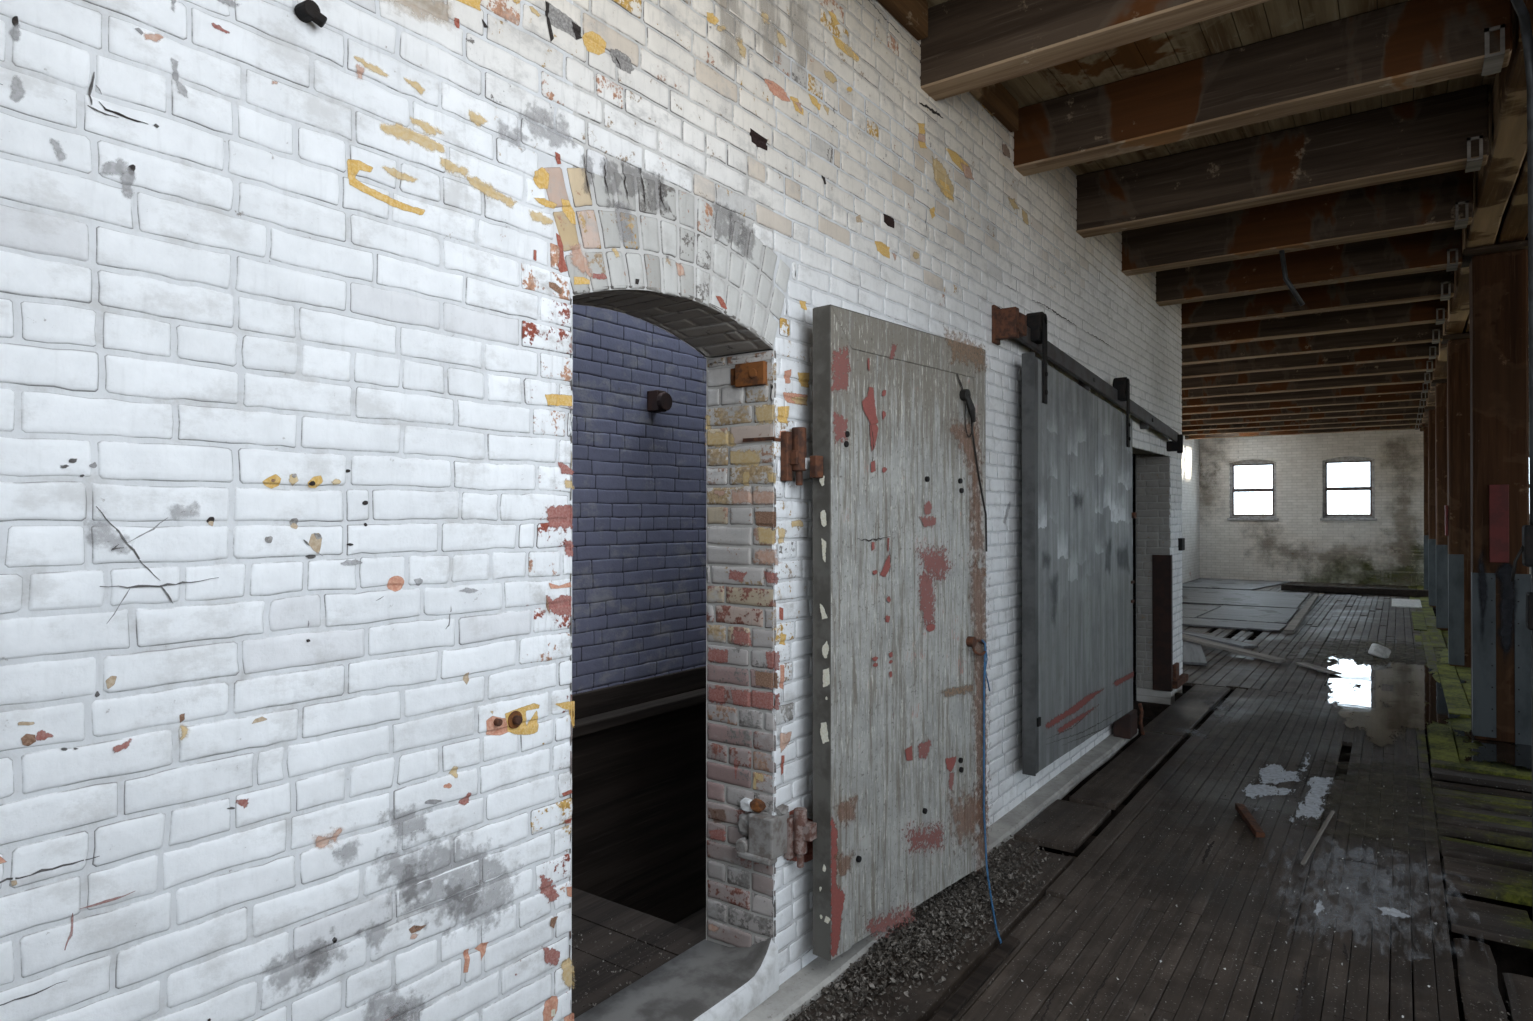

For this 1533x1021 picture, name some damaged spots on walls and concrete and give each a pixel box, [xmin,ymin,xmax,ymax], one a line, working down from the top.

peeling [454,0,488,28]
spalling [514,0,634,74]
peeling [469,111,487,126]
peeling [347,159,425,215]
peeling [381,118,515,207]
peeling [530,152,607,294]
peeling [545,394,572,406]
peeling [545,462,574,557]
crack [96,506,219,623]
peeling [546,582,572,617]
spalling [486,701,575,735]
peeling [540,874,572,928]